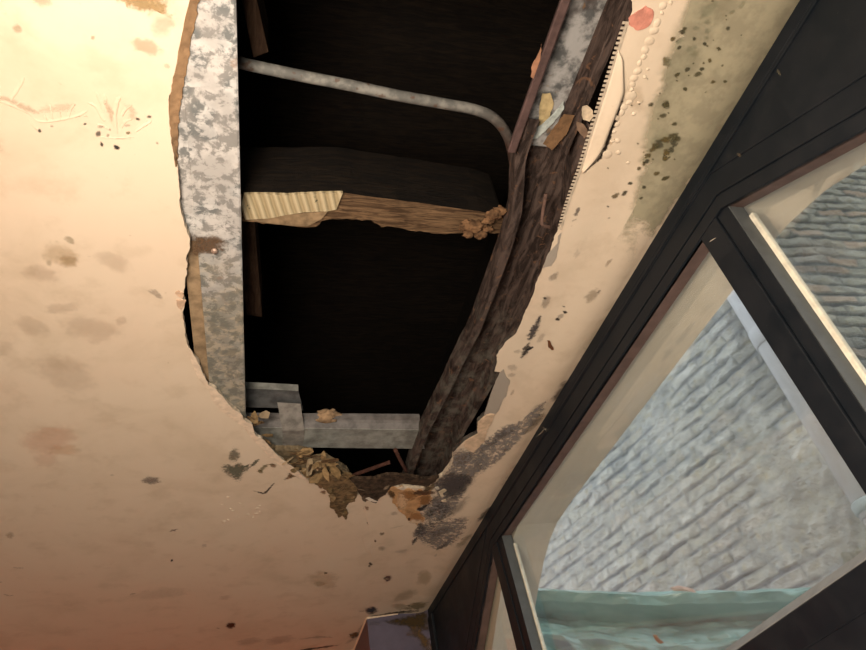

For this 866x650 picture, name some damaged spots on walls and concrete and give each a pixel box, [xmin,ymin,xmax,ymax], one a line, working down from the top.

water stain [126,0,165,13]
spalling [169,0,200,167]
water stain [607,0,800,231]
water stain [224,450,275,480]
spalling [247,411,447,525]
water stain [412,405,543,549]
peeling [463,414,494,453]